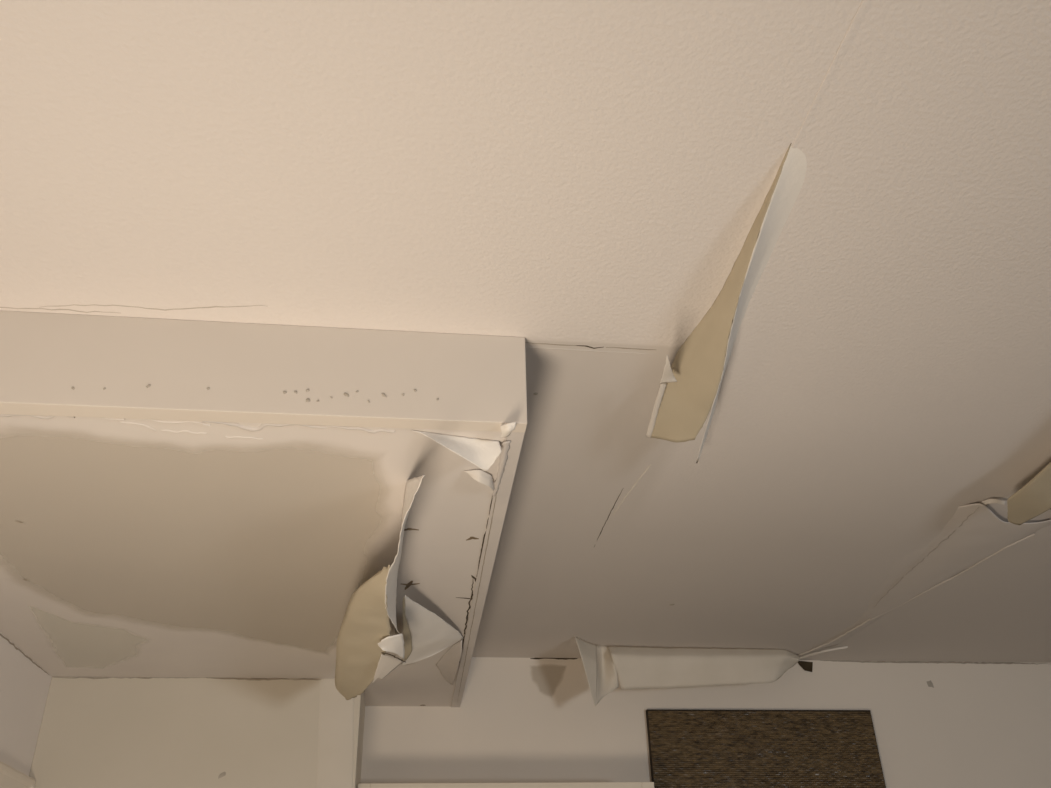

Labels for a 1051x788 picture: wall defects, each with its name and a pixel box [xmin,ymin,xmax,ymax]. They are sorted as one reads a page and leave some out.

peeling [411,421,516,496]
peeling [979,462,1051,525]
peeling [400,595,463,685]